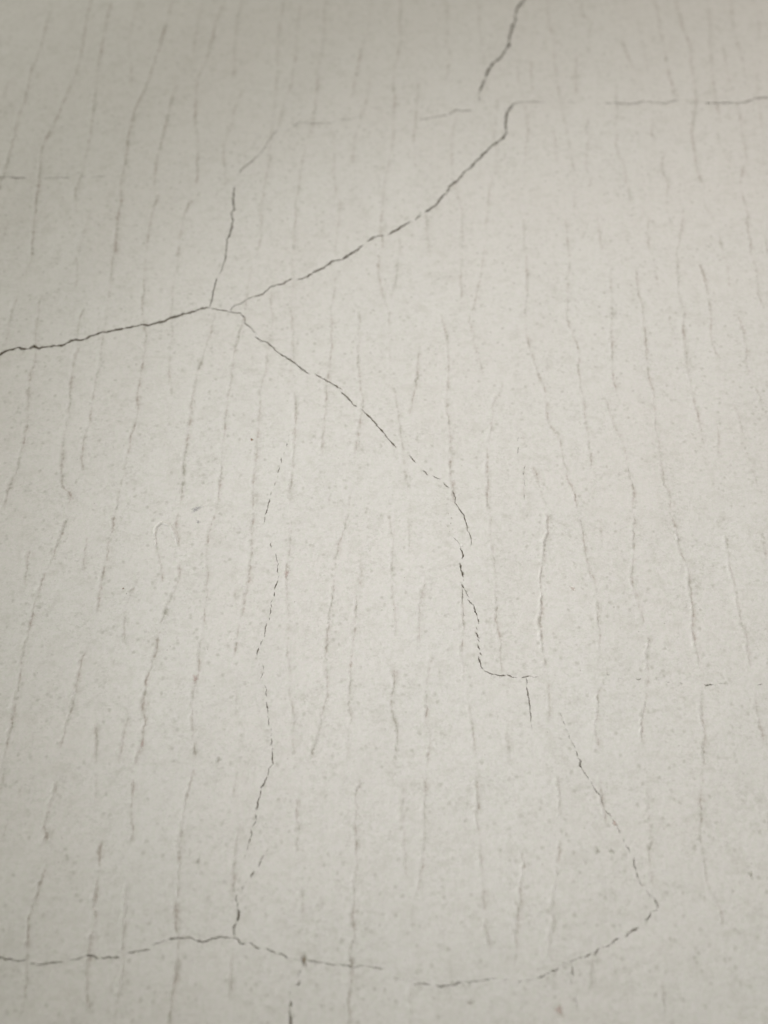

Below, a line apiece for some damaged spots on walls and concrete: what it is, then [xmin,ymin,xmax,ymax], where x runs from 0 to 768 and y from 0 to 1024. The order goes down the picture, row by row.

crack [480,1,524,91]
crack [0,107,531,715]
crack [171,899,287,958]